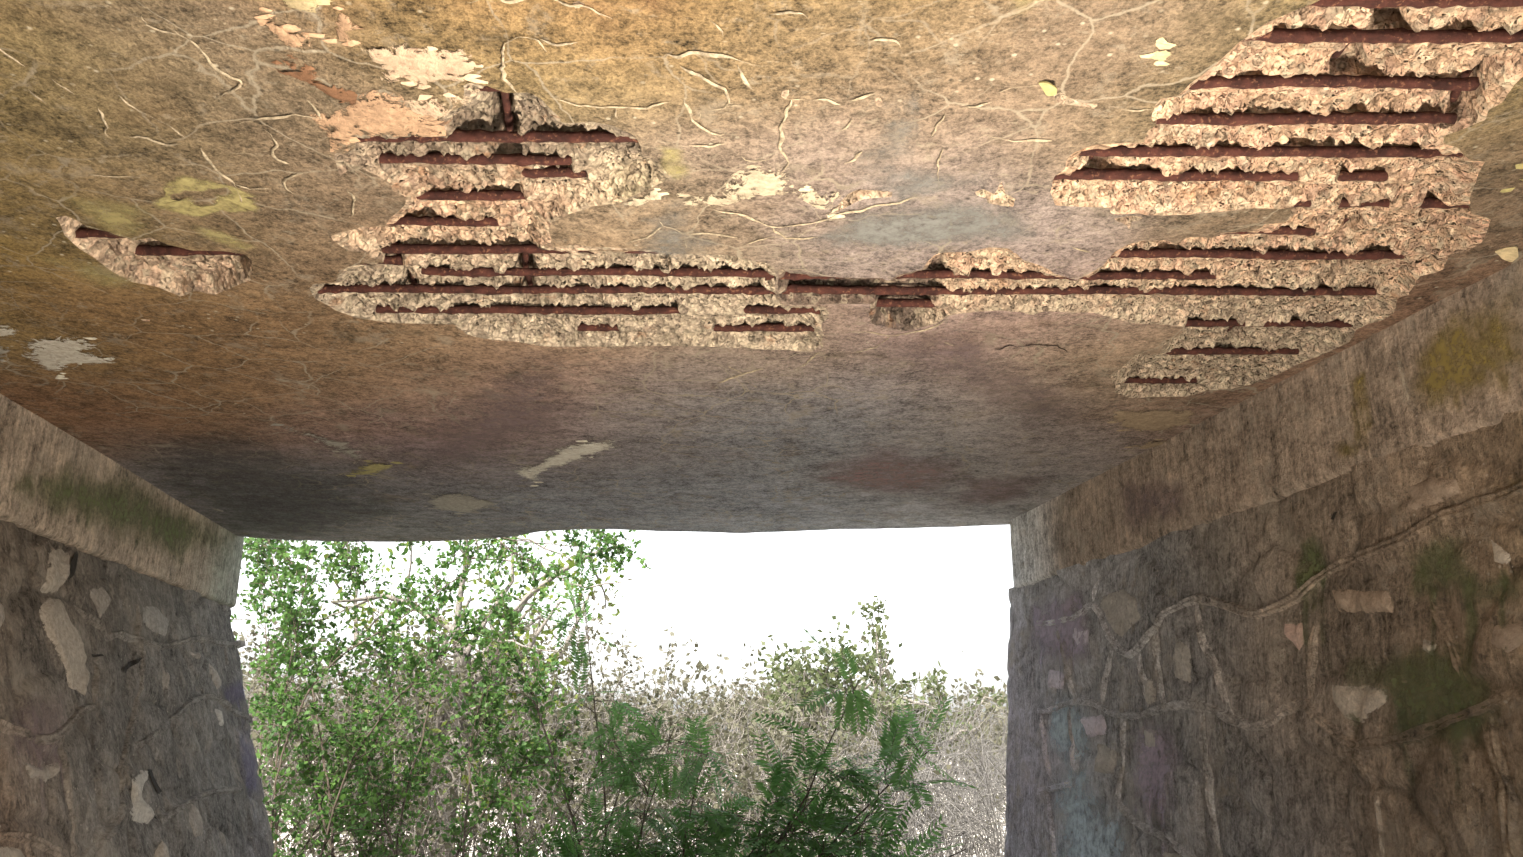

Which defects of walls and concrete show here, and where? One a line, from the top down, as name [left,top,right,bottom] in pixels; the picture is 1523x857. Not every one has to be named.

crack [467,0,612,93]
crack [770,11,809,20]
crack [868,31,910,47]
crack [0,15,322,203]
crack [555,20,876,174]
spalling [56,216,252,296]
crack [347,191,356,216]
crack [628,85,1052,249]
spalling [254,0,1523,432]